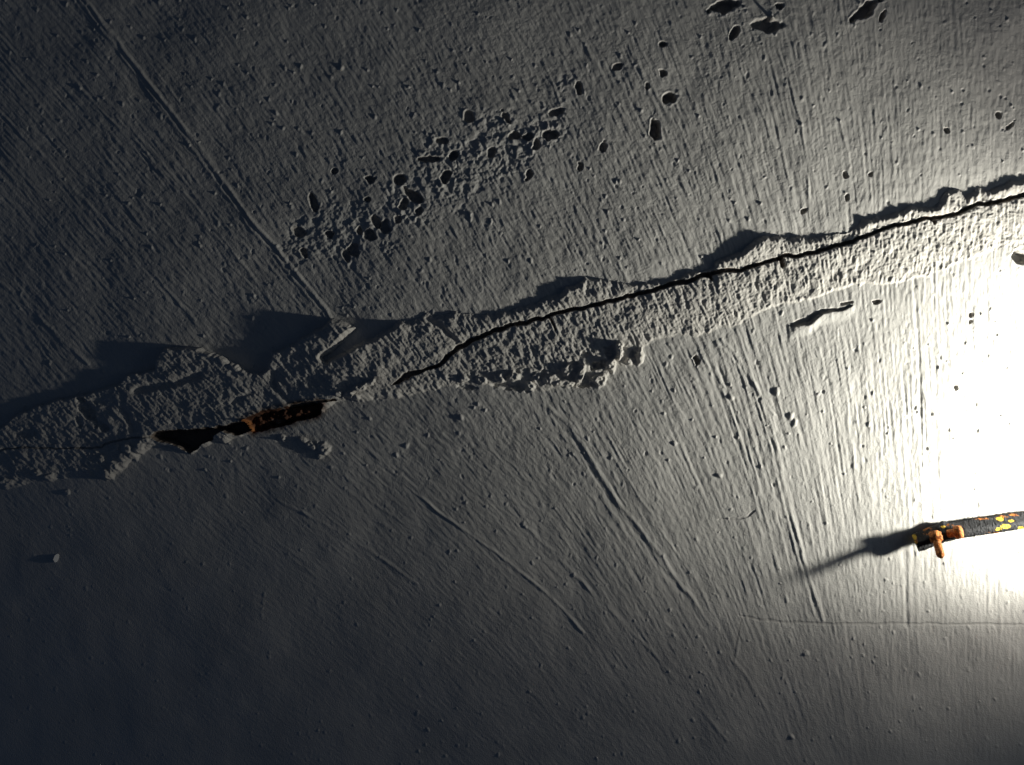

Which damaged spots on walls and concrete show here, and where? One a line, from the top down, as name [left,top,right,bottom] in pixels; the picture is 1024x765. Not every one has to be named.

spalling [278,73,582,276]
crack [393,192,1024,385]
rust [234,395,330,439]
spalling [273,430,332,462]